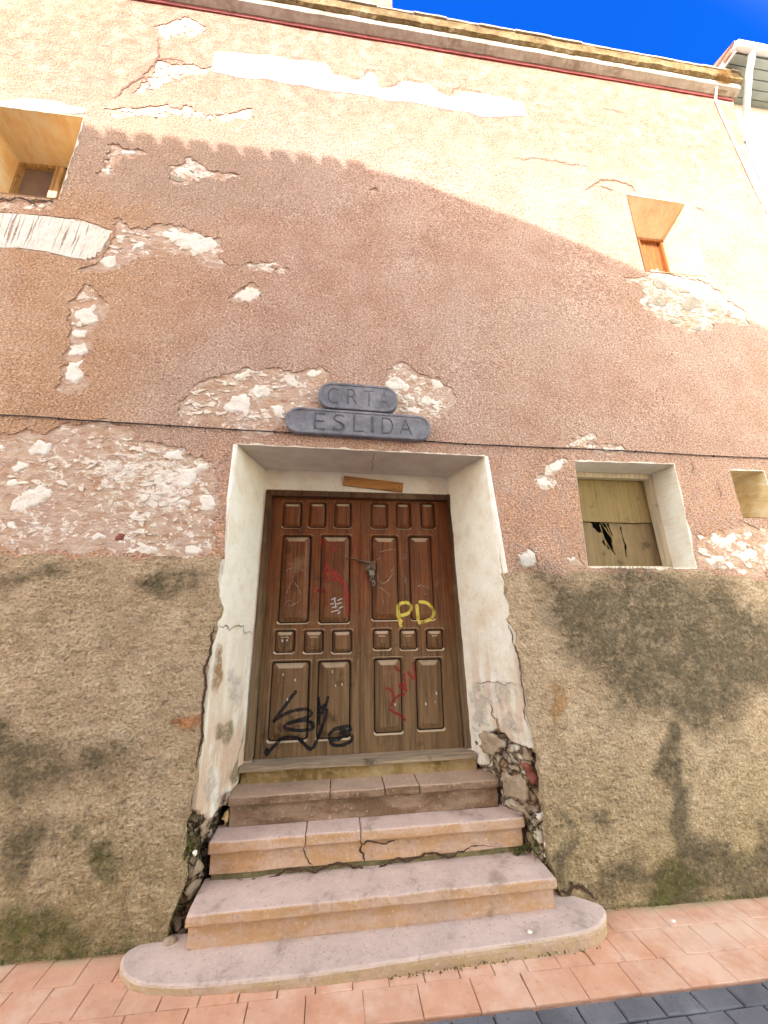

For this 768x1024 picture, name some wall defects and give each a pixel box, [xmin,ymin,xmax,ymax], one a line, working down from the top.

crack [105,37,187,98]
flaking render [0,198,290,396]
peeling [178,366,331,439]
peeling [384,362,457,419]
peeling [0,418,222,559]
water stain [137,570,197,597]
crack [196,624,253,766]
water stain [0,719,67,799]
flaking render [475,686,550,871]
water stain [541,566,768,905]
water stain [3,825,45,879]
crack [237,838,493,880]